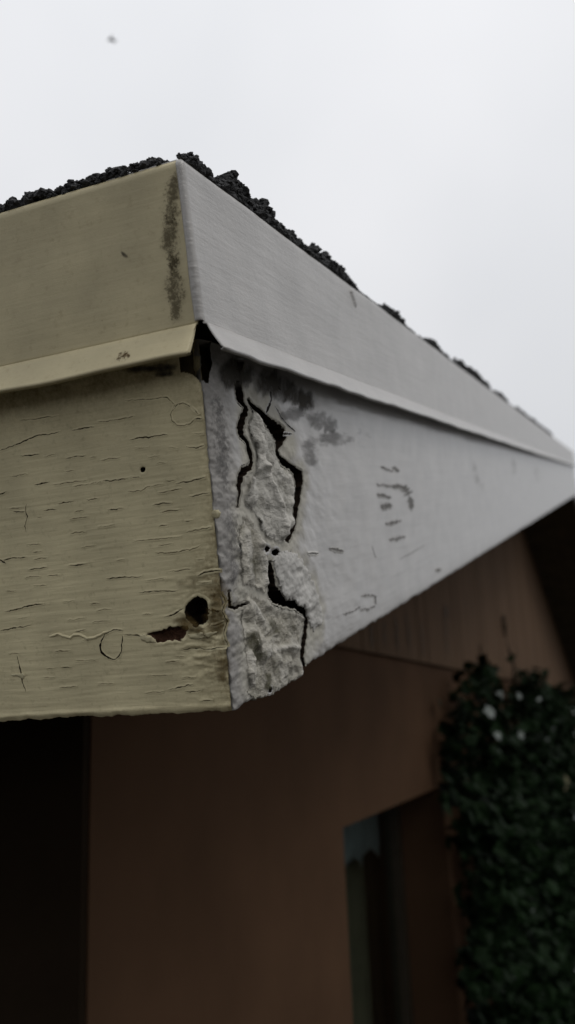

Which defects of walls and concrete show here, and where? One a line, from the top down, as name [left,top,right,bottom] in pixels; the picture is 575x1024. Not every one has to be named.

leakage [162,176,185,320]
crack [0,362,309,703]
spalling [139,623,218,646]
peeling [264,543,344,632]